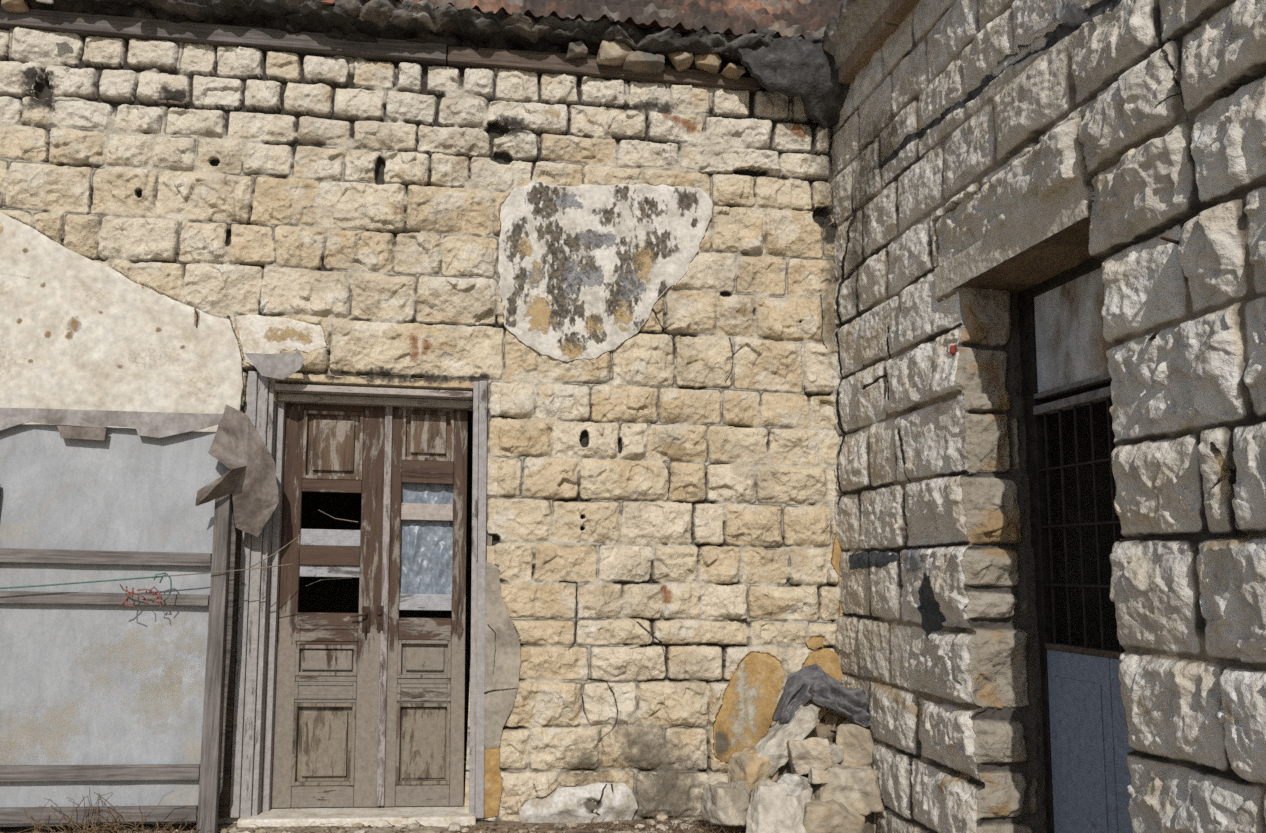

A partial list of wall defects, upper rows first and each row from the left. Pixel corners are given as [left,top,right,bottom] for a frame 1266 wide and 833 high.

leakage [503,182,698,353]
crack [582,678,618,749]